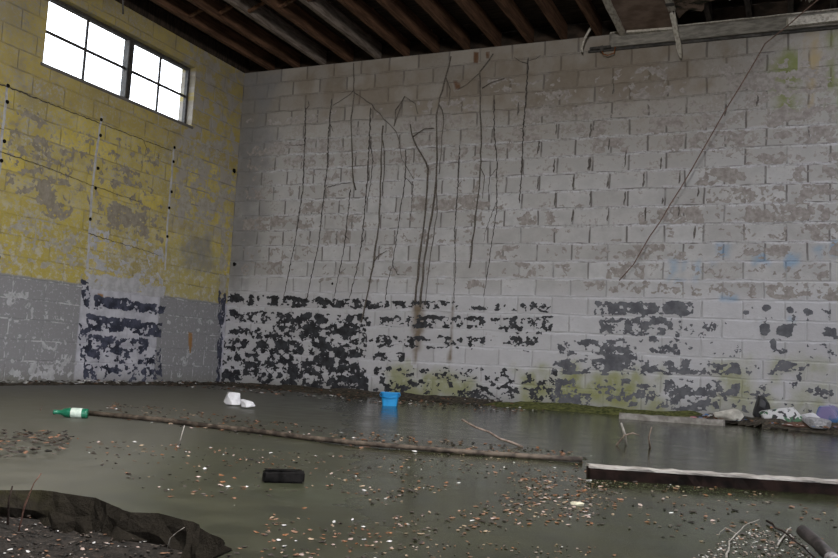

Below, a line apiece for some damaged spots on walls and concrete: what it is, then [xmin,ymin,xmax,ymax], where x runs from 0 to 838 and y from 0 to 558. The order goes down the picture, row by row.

peeling [0,97,838,413]
leakage [173,35,806,302]
leakage [816,29,838,121]